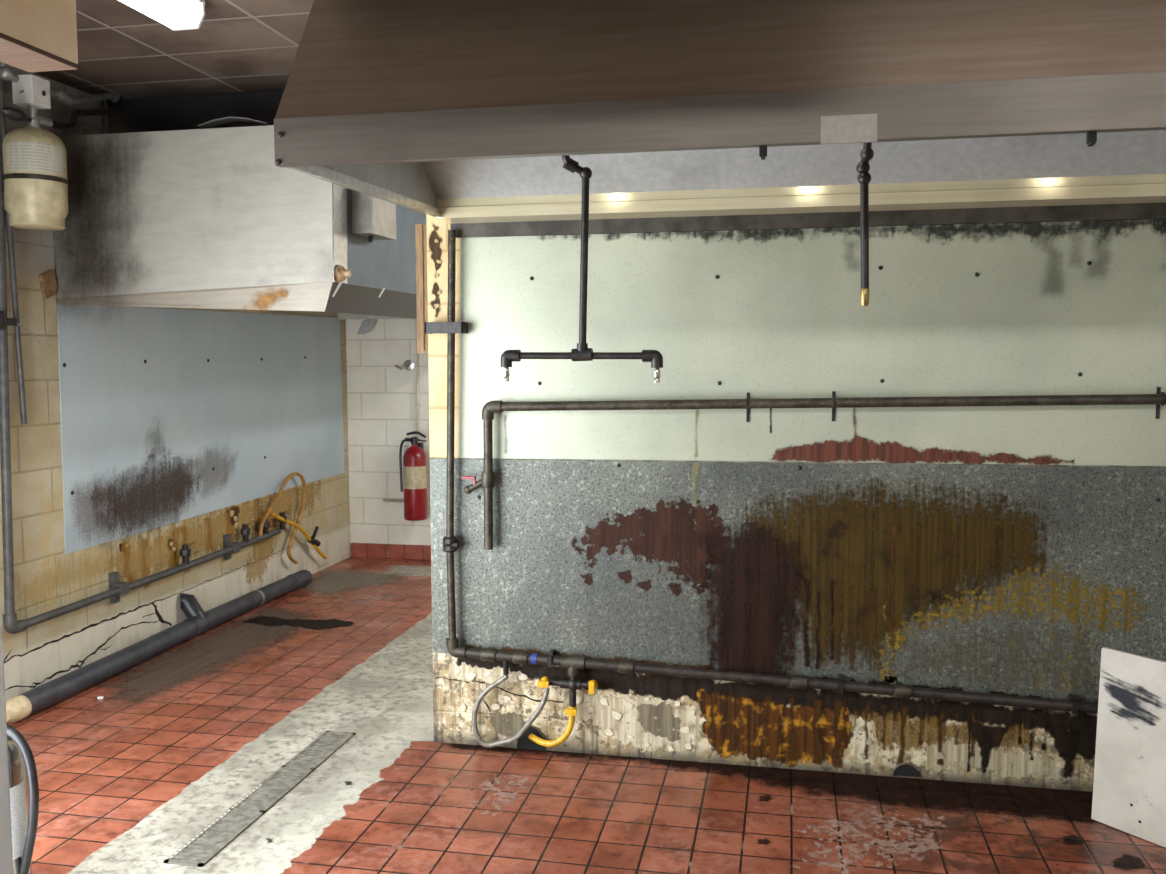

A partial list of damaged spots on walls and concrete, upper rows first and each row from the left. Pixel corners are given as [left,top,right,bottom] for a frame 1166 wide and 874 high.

crack [4,536,287,691]
peeling [449,662,546,751]
peeling [562,689,707,753]
rust [467,496,1040,767]